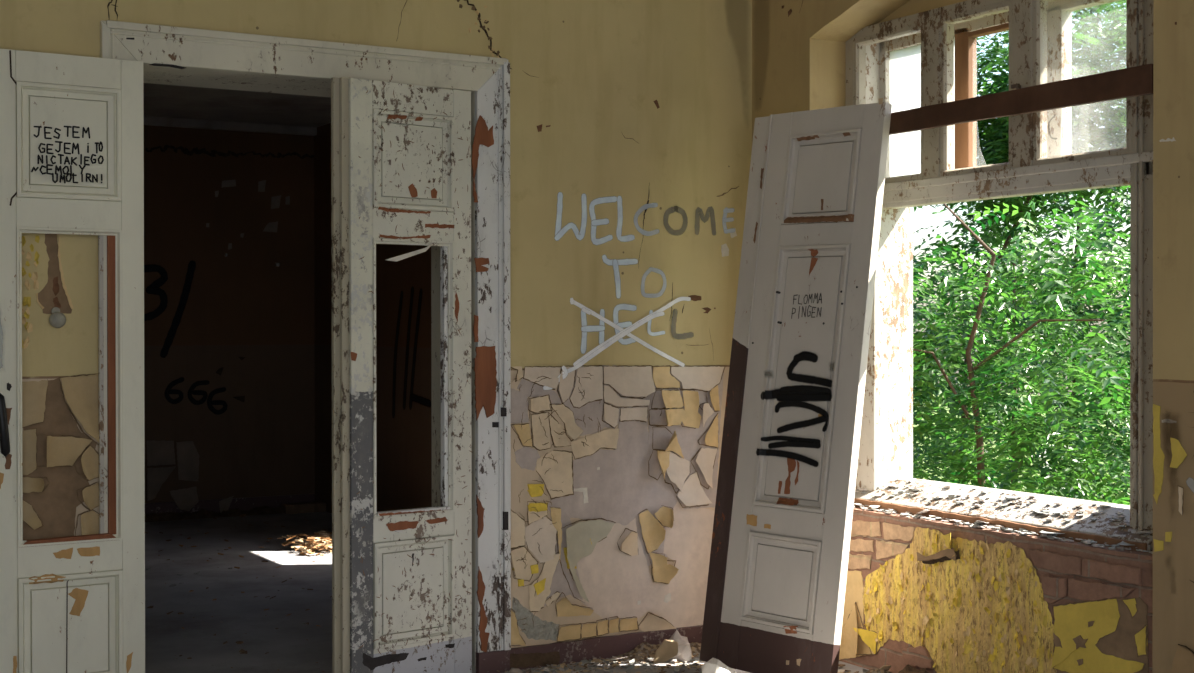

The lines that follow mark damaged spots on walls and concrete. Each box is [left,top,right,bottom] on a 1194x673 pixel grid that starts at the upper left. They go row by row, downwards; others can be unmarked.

crack [107,0,118,18]
crack [457,0,539,78]
peeling [22,374,100,540]
flaking render [473,315,726,664]
peeling [839,505,1149,673]